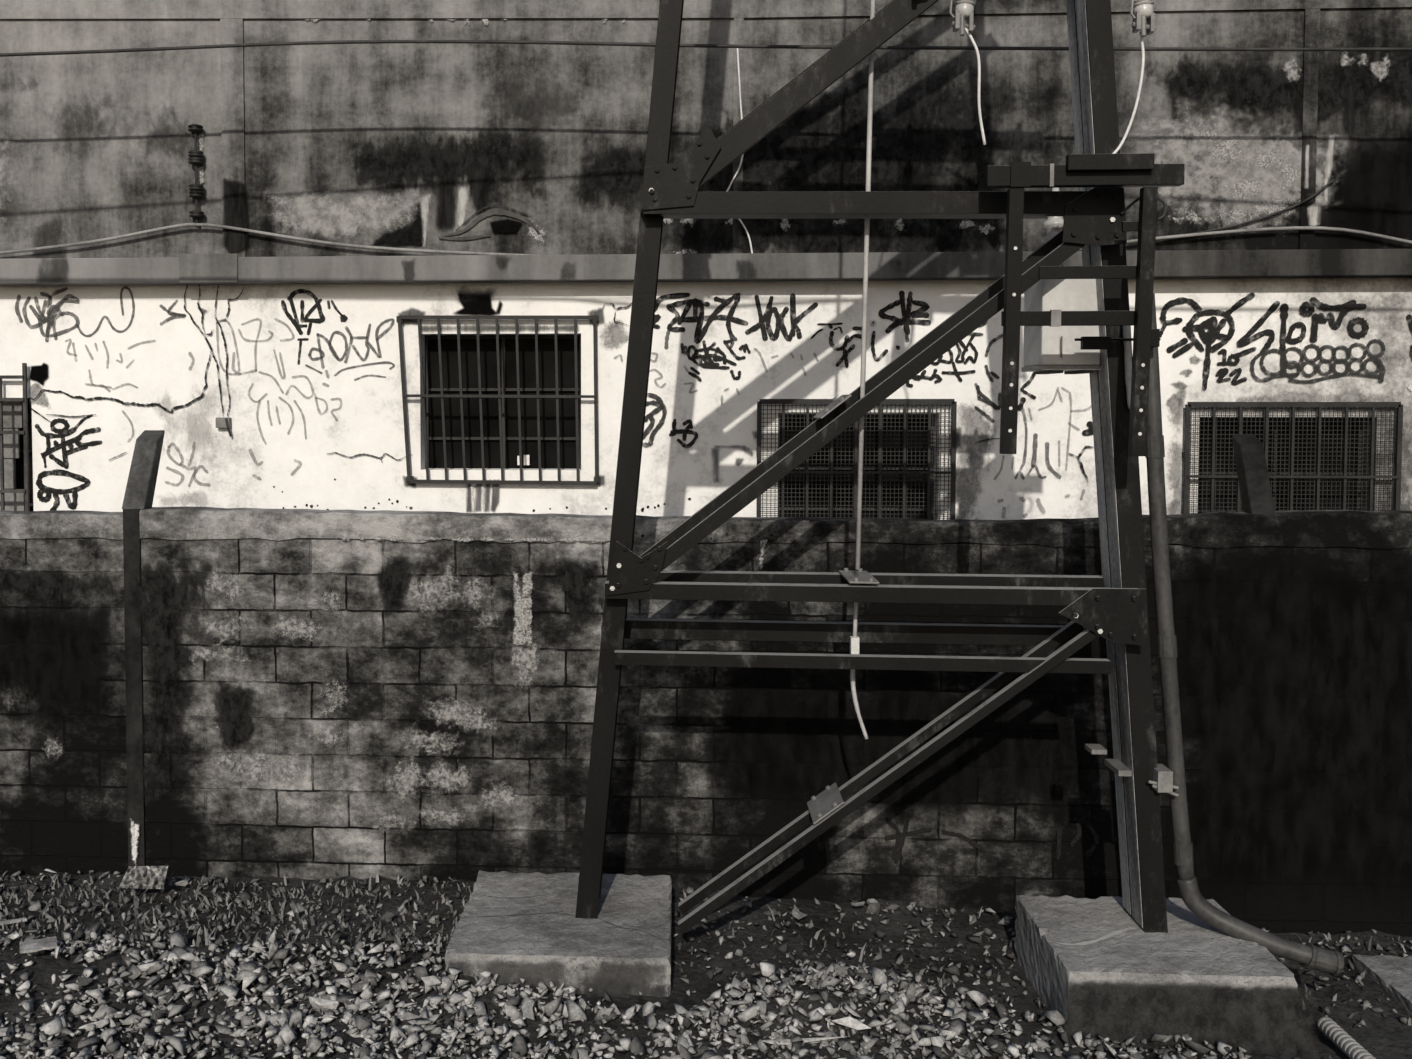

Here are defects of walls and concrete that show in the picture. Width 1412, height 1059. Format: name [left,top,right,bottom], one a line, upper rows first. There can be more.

water stain [146,110,194,154]
water stain [576,147,646,205]
water stain [708,86,1001,192]
water stain [1147,55,1412,247]
water stain [33,218,67,284]
water stain [223,178,248,254]
water stain [673,219,1006,280]
crack [29,284,244,422]
water stain [0,562,211,799]
water stain [215,685,254,750]
water stain [1178,561,1412,886]